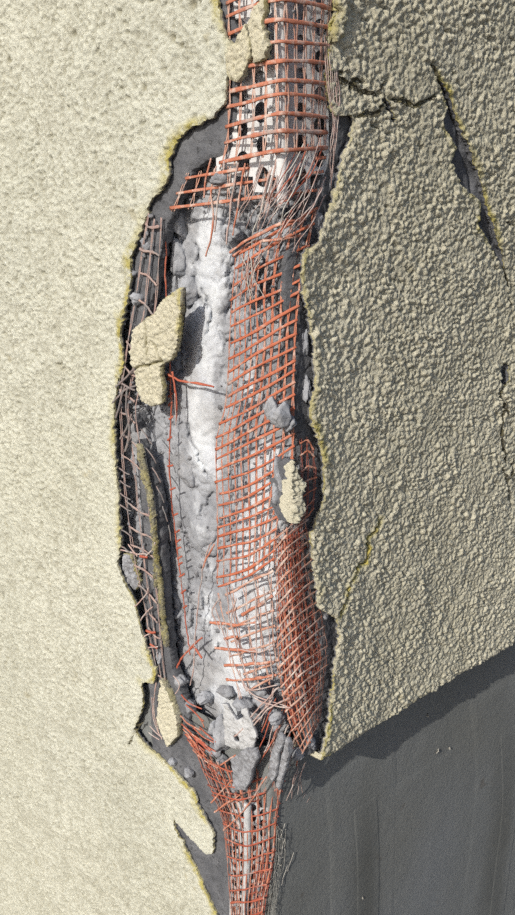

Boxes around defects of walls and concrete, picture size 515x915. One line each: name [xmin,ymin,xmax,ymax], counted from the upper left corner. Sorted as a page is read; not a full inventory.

crack [331,64,515,305]
spalling [112,0,355,915]
crack [340,522,380,615]
crack [499,363,515,501]